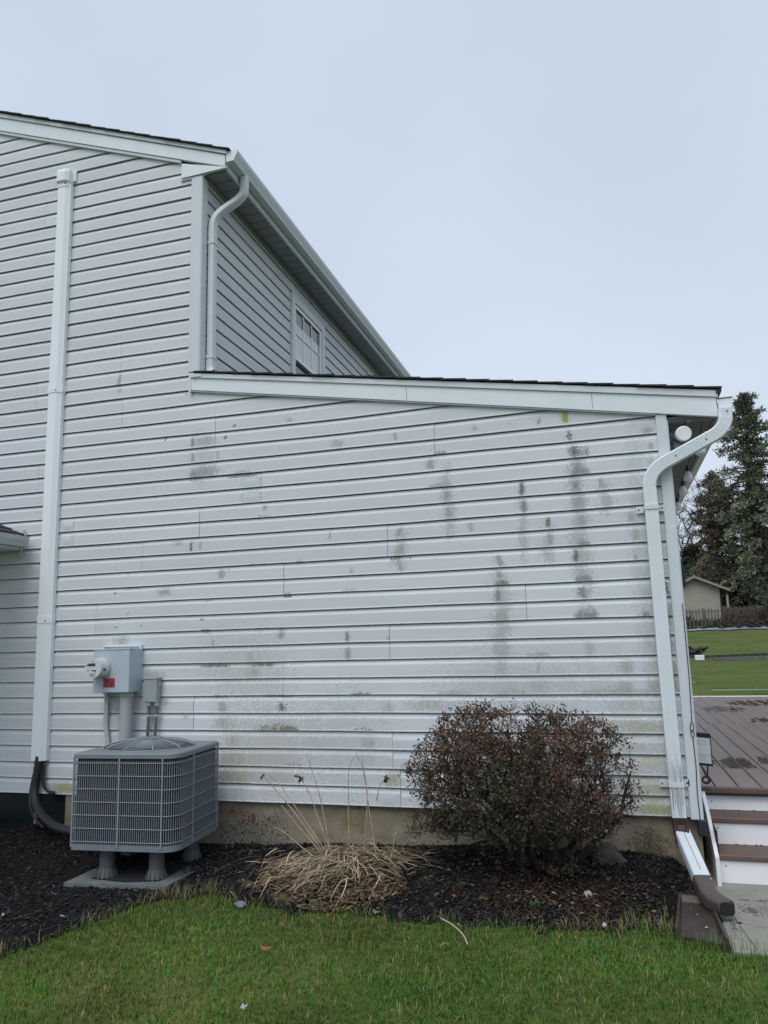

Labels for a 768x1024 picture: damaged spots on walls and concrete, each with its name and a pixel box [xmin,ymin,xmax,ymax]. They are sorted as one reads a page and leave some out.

water stain [189,435,268,511]
water stain [514,437,652,618]
water stain [483,554,549,694]